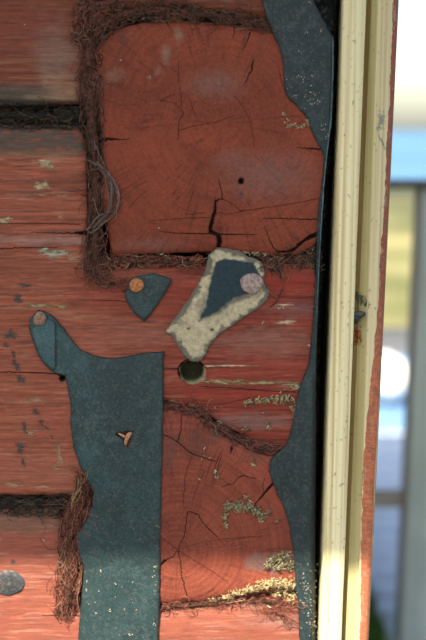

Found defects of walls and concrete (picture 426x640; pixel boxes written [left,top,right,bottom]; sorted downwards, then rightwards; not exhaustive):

crack [154,178,319,255]